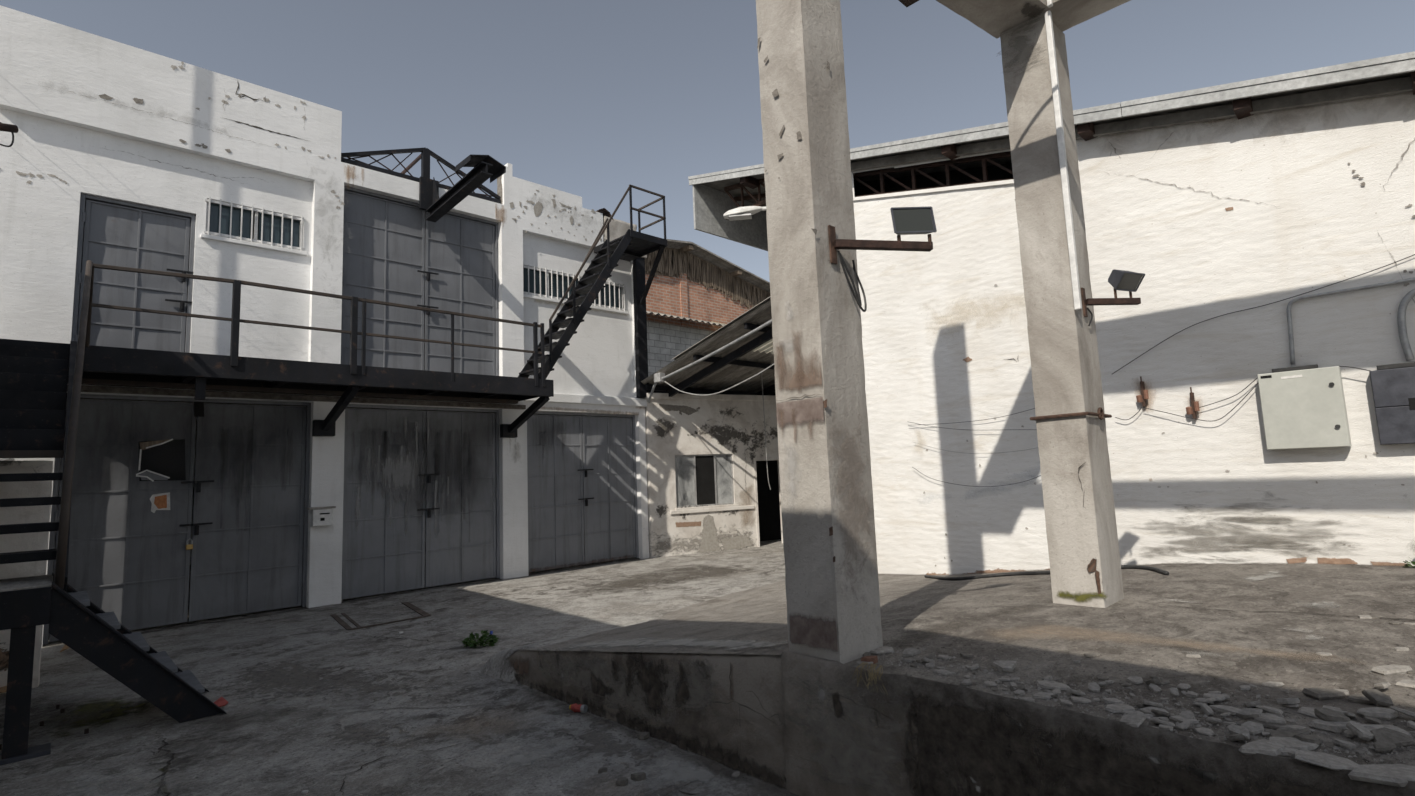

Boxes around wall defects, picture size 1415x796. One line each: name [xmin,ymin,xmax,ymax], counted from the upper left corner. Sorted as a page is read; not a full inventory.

peeling [196,94,306,120]
peeling [659,404,700,415]
water stain [1146,506,1343,564]
water stain [506,638,795,796]
crack [149,731,175,796]